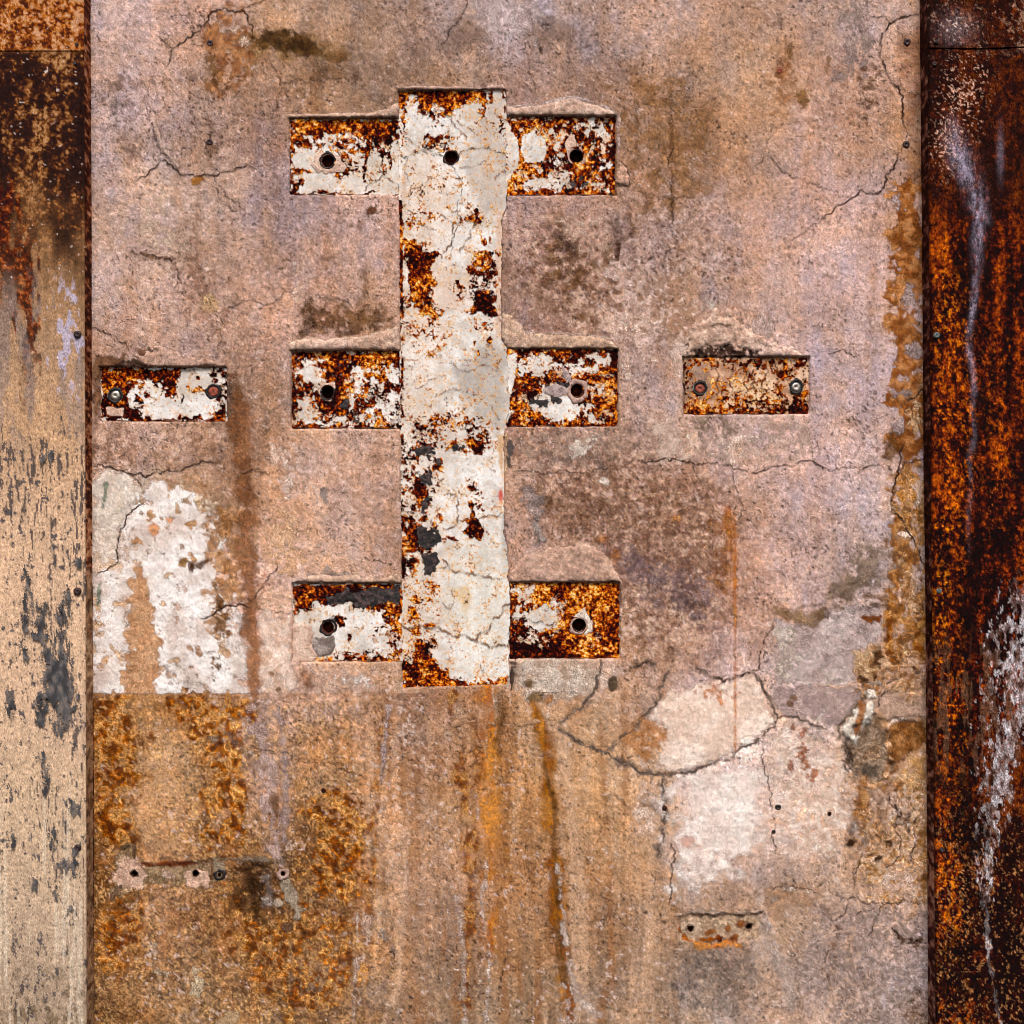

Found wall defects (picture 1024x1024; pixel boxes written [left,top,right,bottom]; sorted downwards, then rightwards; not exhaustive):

crack [760,13,919,239]
peeling [39,444,59,471]
rust [101,367,228,422]
rust [683,356,809,415]
peeling [69,442,377,695]
rust [290,68,715,1024]
rust [94,693,154,846]
rust [163,687,259,859]
rust [214,712,384,1024]
crack [540,623,901,903]
crack [762,857,919,944]
crack [874,796,917,868]